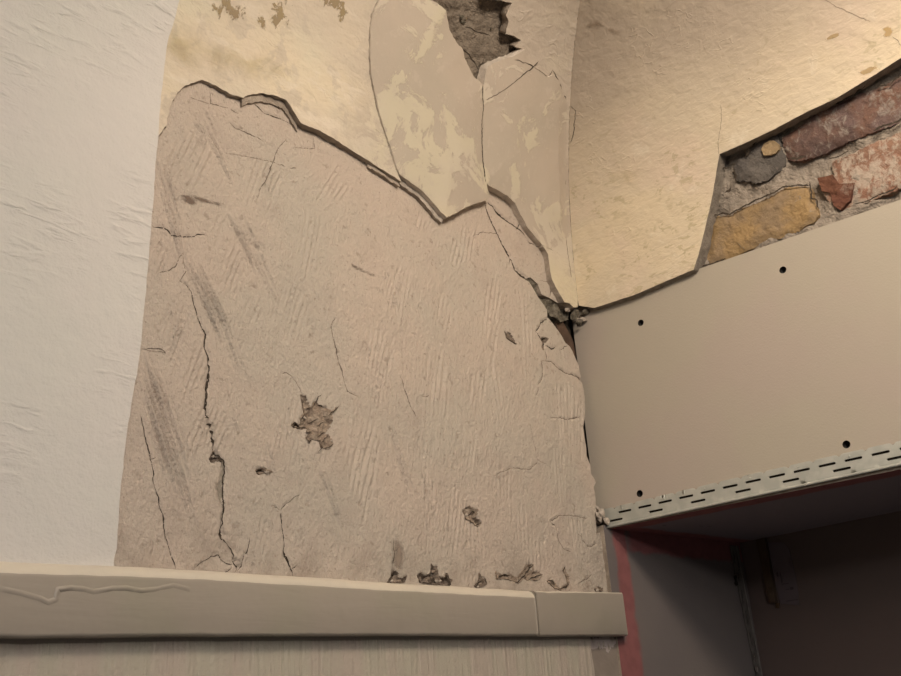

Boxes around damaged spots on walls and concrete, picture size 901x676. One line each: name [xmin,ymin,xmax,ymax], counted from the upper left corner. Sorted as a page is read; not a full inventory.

water stain [212,0,245,20]
water stain [258,3,289,29]
water stain [324,0,348,22]
spalling [432,0,516,79]
crack [481,60,576,181]
flaking render [703,66,901,267]
crack [478,203,551,294]
crack [141,223,250,572]
spalling [291,395,339,451]
crack [273,495,299,576]
spalling [387,537,453,586]
spalling [468,564,570,590]